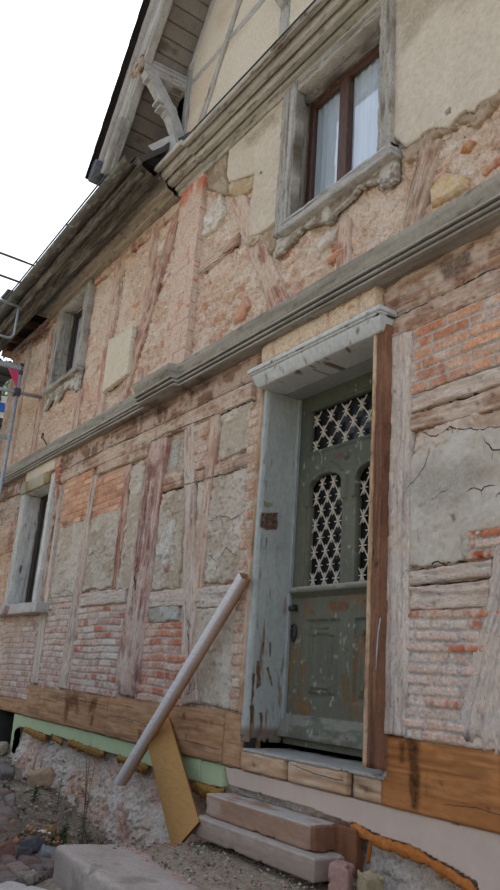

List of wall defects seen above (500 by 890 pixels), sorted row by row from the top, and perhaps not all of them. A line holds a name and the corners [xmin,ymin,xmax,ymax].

spalling [400,91,500,165]
spalling [202,154,261,237]
crack [405,392,500,493]
peeling [260,502,278,542]
crack [432,485,500,500]
peeling [250,661,272,723]
water stain [401,739,419,807]